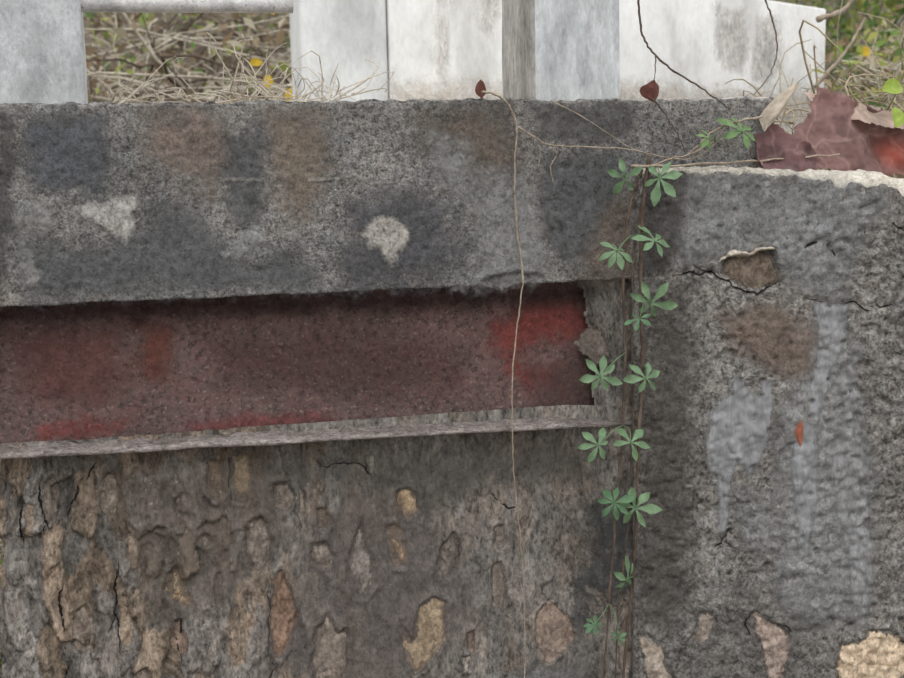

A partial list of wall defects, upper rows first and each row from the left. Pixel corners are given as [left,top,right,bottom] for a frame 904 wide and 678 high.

water stain [532,102,634,142]
rust [0,290,584,320]
water stain [339,189,460,291]
water stain [470,173,540,283]
peeling [492,302,609,384]
crack [673,266,776,295]
spalling [719,247,780,289]
crack [19,462,97,543]
water stain [790,421,820,561]
crack [108,564,121,655]
flaking render [752,611,790,678]
flaking render [835,619,904,678]